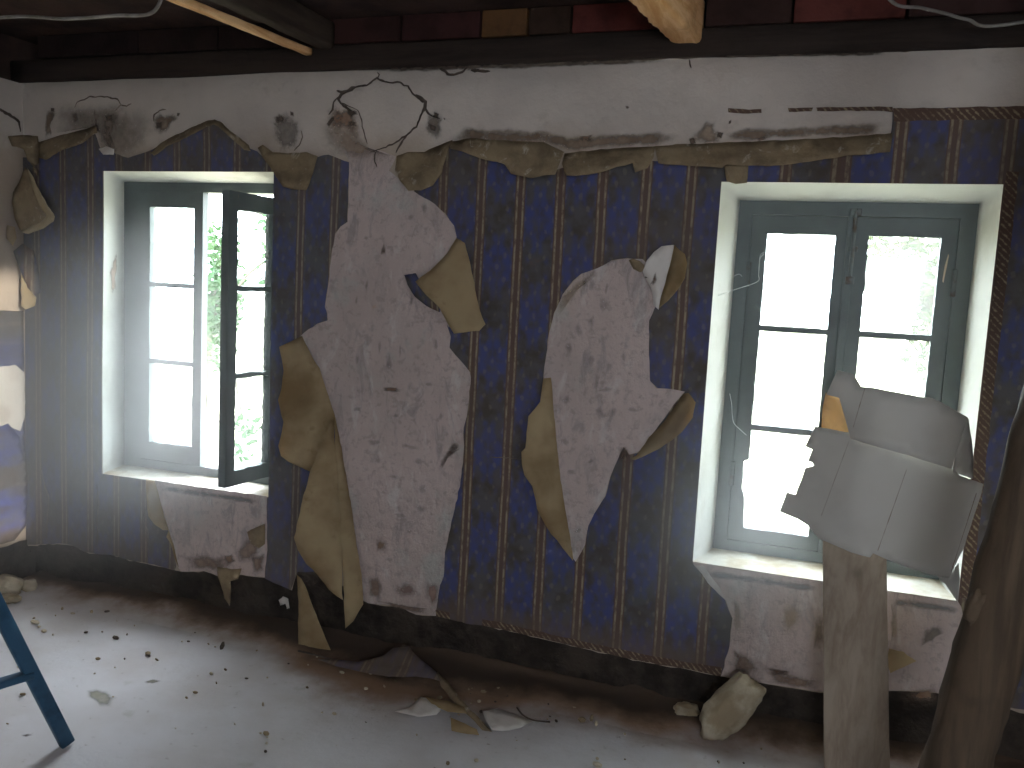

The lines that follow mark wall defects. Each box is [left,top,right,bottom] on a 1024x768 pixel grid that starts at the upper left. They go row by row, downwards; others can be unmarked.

crack [75,96,130,112]
crack [328,72,440,167]
peeling [0,108,824,725]
peeling [887,591,963,744]
flaking render [997,710,1024,761]